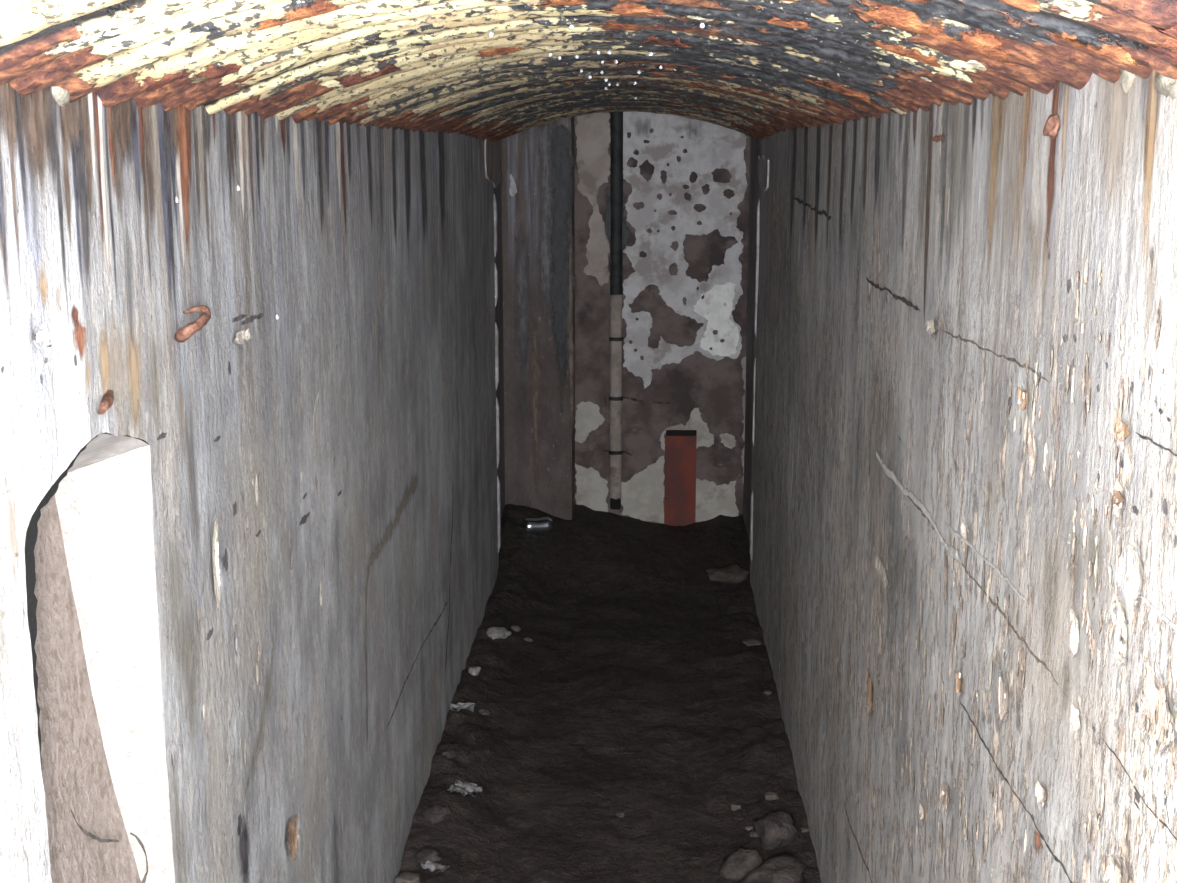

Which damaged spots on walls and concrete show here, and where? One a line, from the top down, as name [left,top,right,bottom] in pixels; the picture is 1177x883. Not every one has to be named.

corrosion [340,64,400,88]
corrosion [475,46,525,57]
corrosion [535,0,692,48]
corrosion [764,15,813,30]
corrosion [847,0,1018,69]
peeling [965,60,986,71]
peeling [575,111,770,561]
crack [944,331,1048,382]
crack [1135,432,1177,456]
crack [962,563,1058,684]
crack [960,702,1072,883]
crack [1102,738,1177,840]